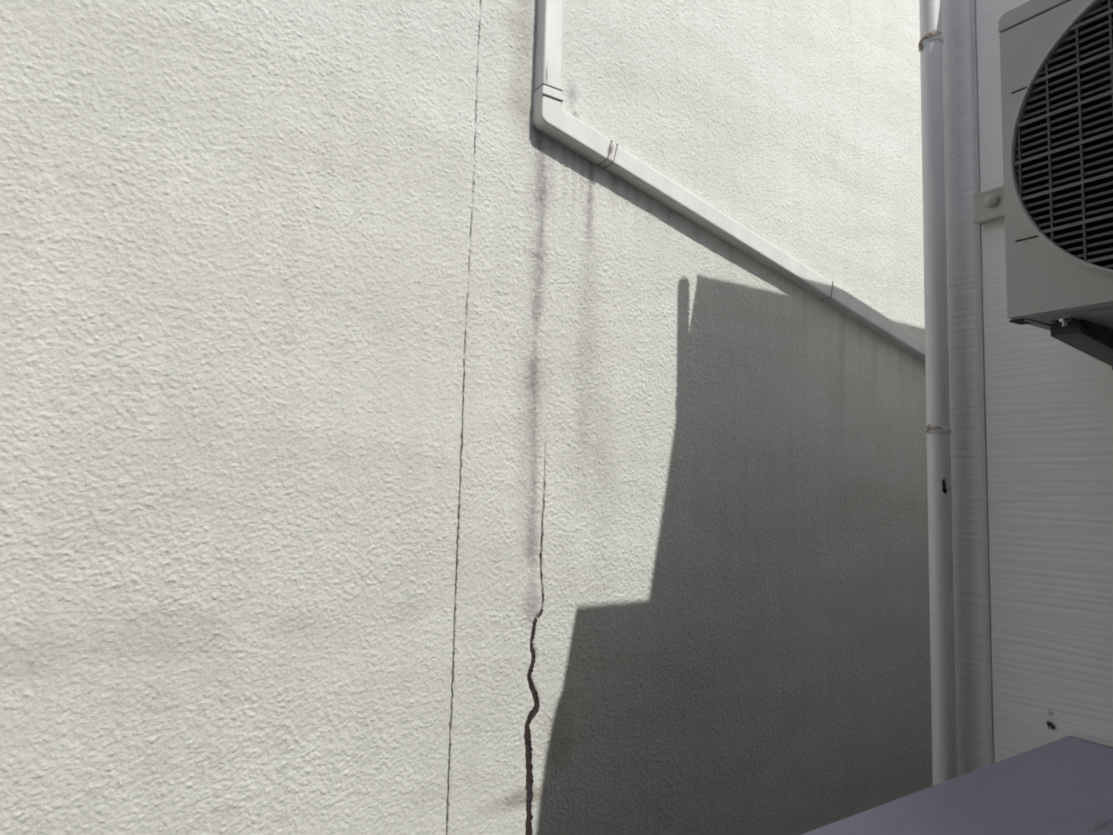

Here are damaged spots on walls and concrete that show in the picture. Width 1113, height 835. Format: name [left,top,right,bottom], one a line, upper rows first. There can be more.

crack [524,481,545,835]